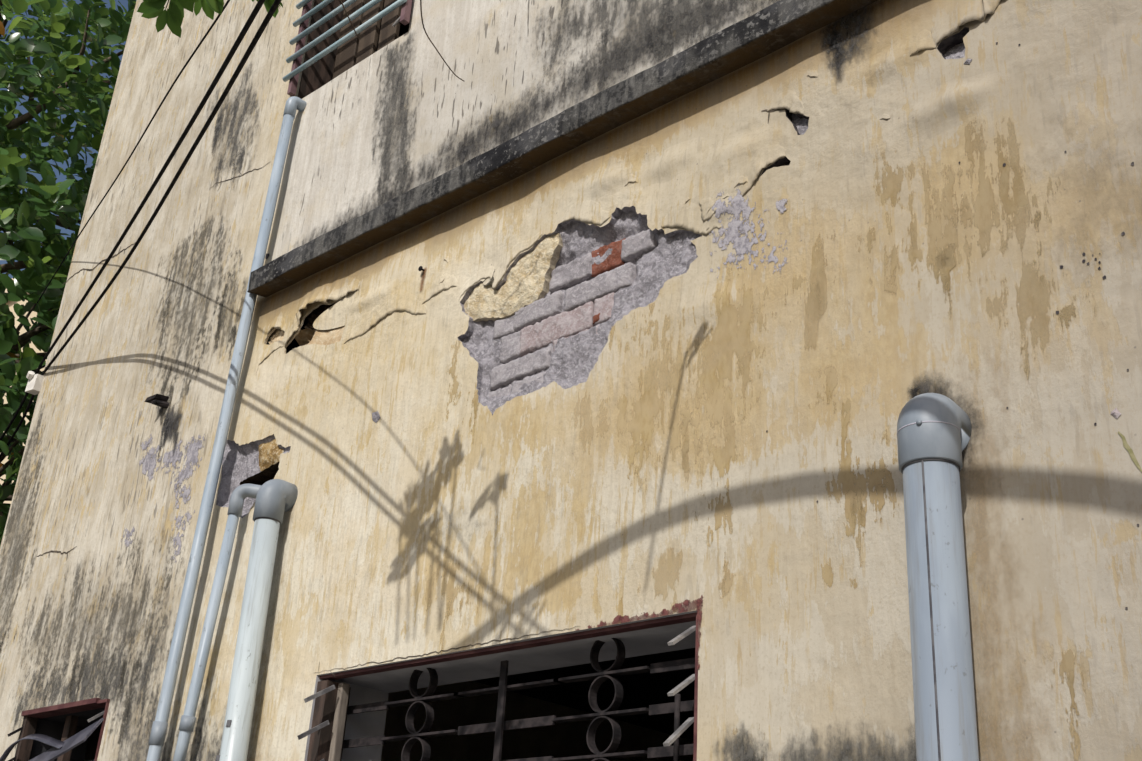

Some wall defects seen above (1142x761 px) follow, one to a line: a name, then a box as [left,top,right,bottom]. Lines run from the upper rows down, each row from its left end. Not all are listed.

water stain [302,0,779,244]
spalling [767,90,809,135]
water stain [822,6,871,79]
spalling [909,0,1001,64]
water stain [159,218,245,404]
spalling [254,144,791,443]
water stain [0,421,43,638]
spalling [216,434,291,518]
peeling [592,268,773,546]
water stain [14,543,222,761]
water stain [723,730,763,761]
water stain [783,736,917,761]